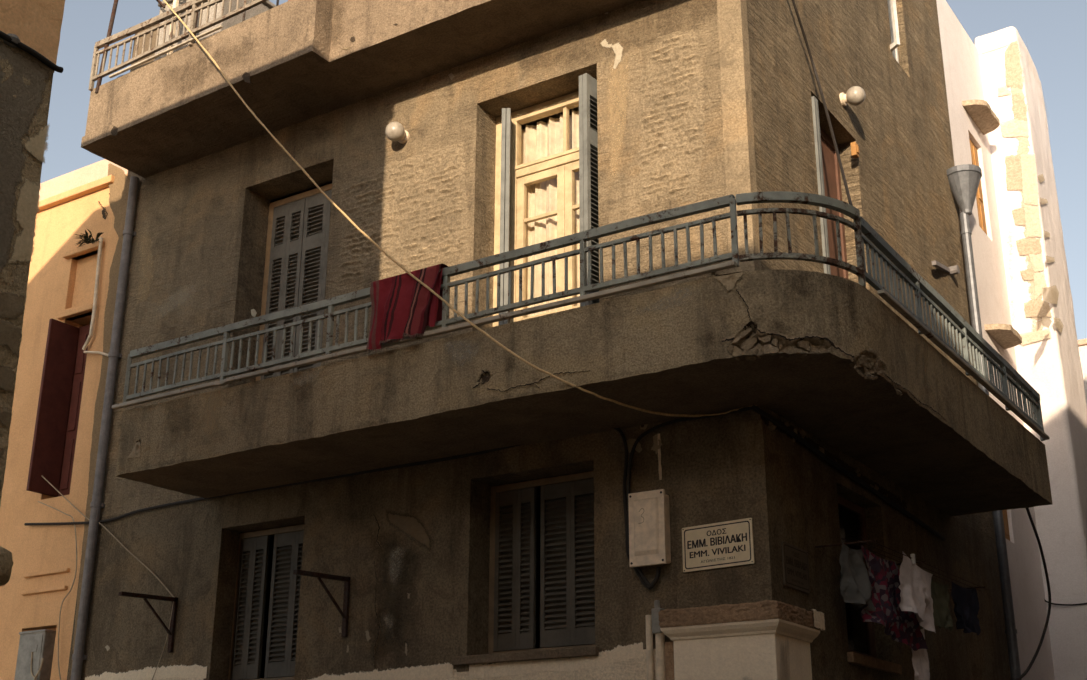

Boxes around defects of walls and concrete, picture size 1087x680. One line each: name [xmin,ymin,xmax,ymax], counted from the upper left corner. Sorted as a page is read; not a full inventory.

peeling [600,39,623,69]
peeling [24,125,49,163]
peeling [9,179,41,263]
peeling [0,292,25,391]
spalling [727,321,835,361]
crack [710,272,947,422]
crack [486,370,590,394]
peeling [0,407,12,429]